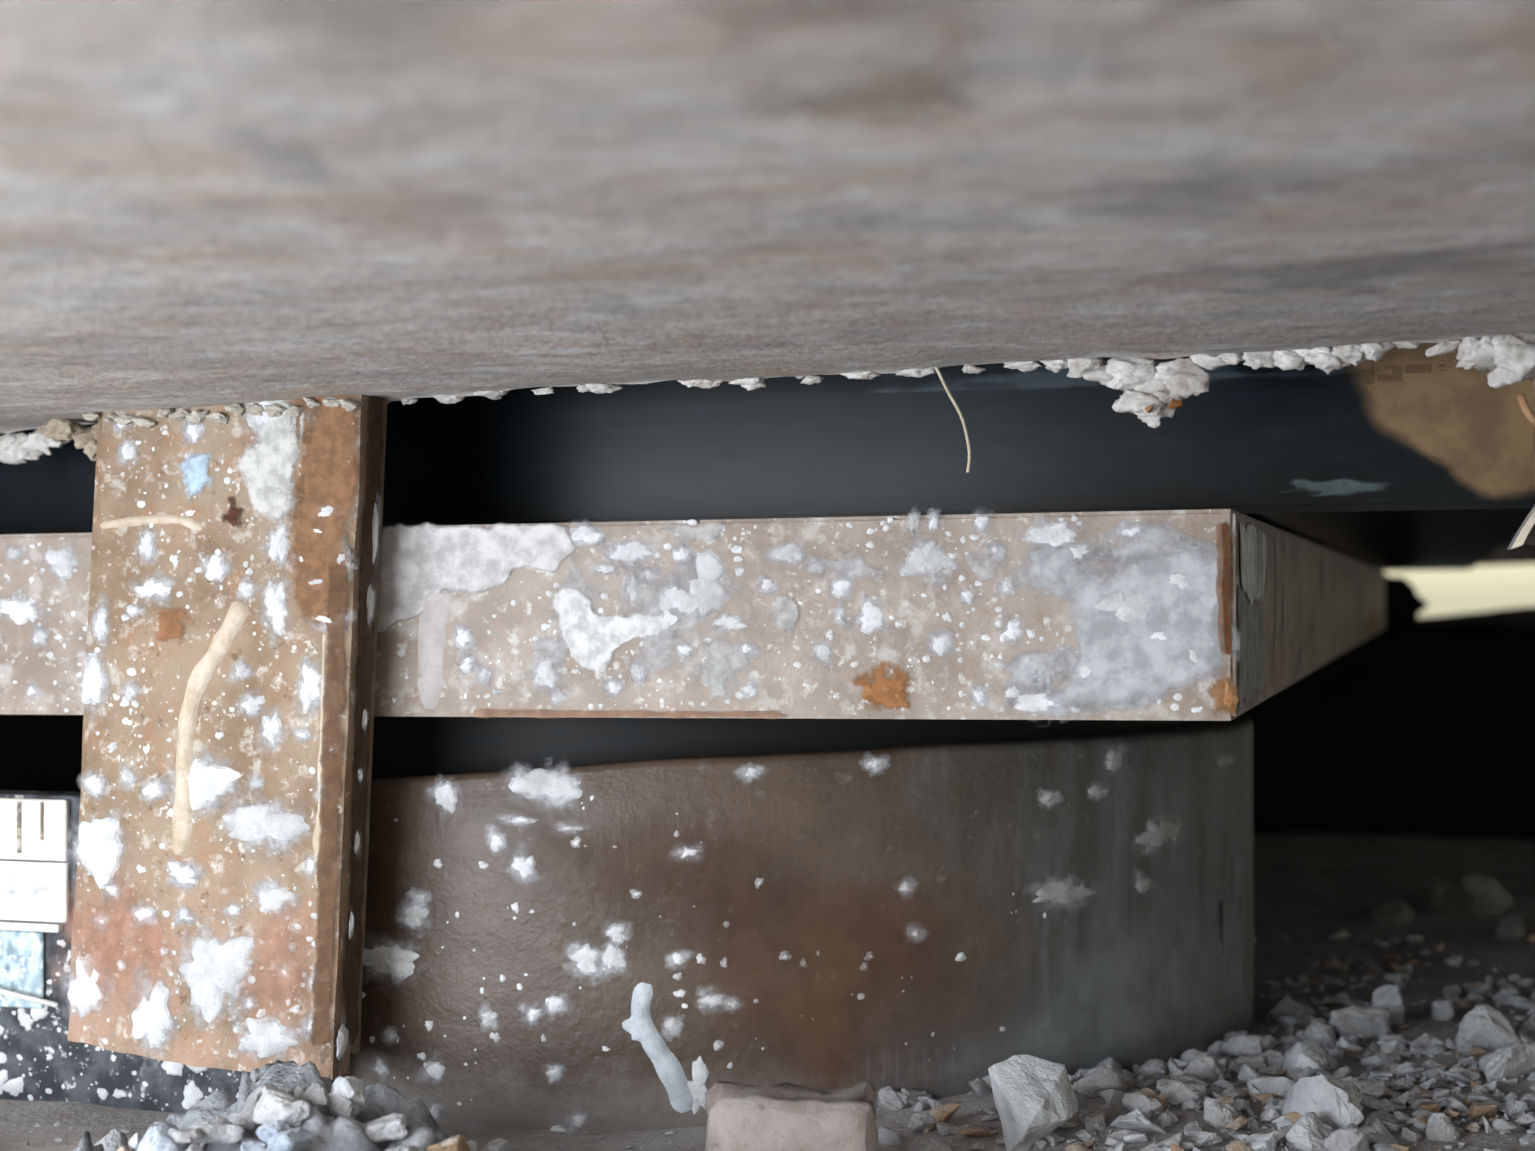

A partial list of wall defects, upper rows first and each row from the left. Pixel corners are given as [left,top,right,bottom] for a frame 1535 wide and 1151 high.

leakage [918,367,1100,391]
leakage [1204,370,1243,379]
leakage [1293,479,1382,496]
corrosion [156,609,189,641]
corrosion [854,662,909,709]
corrosion [1208,677,1239,714]
corrosion [263,394,384,1045]
corrosion [70,908,158,989]
leakage [1027,916,1247,1054]